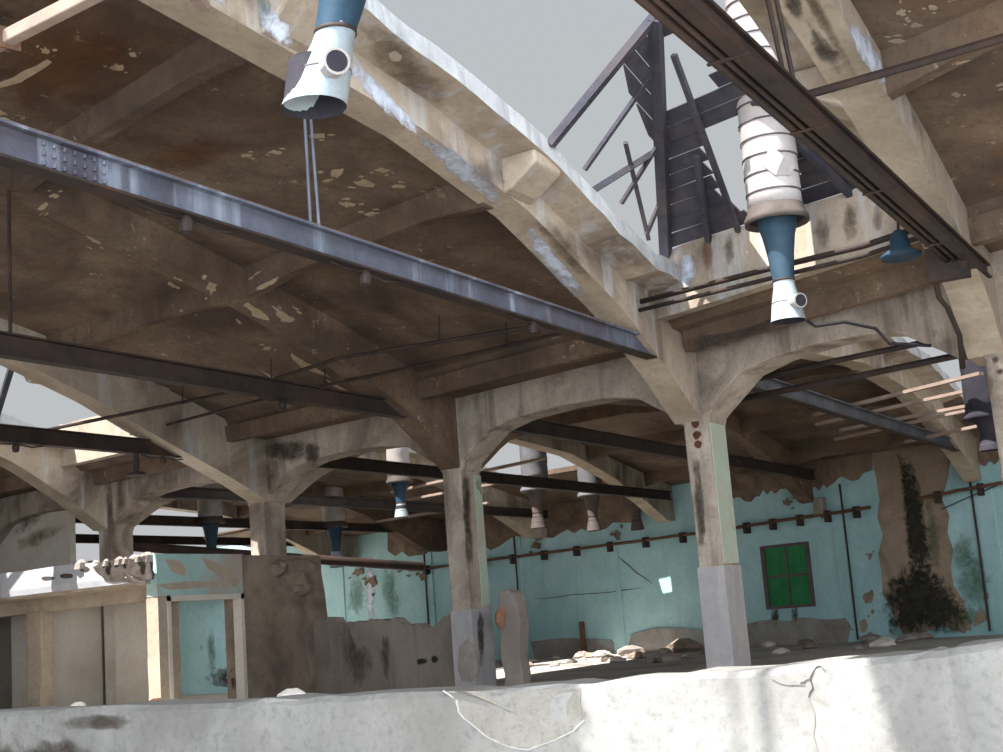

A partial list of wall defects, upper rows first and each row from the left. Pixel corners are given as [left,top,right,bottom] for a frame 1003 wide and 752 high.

water stain [787,0,837,60]
peeling [0,45,57,88]
water stain [849,26,885,83]
water stain [265,442,318,487]
peeling [976,436,999,466]
peeling [730,471,795,509]
flaking render [747,444,989,647]
water stain [356,569,374,619]
water stain [89,716,122,729]
crack [773,666,825,752]
water stain [33,742,77,752]